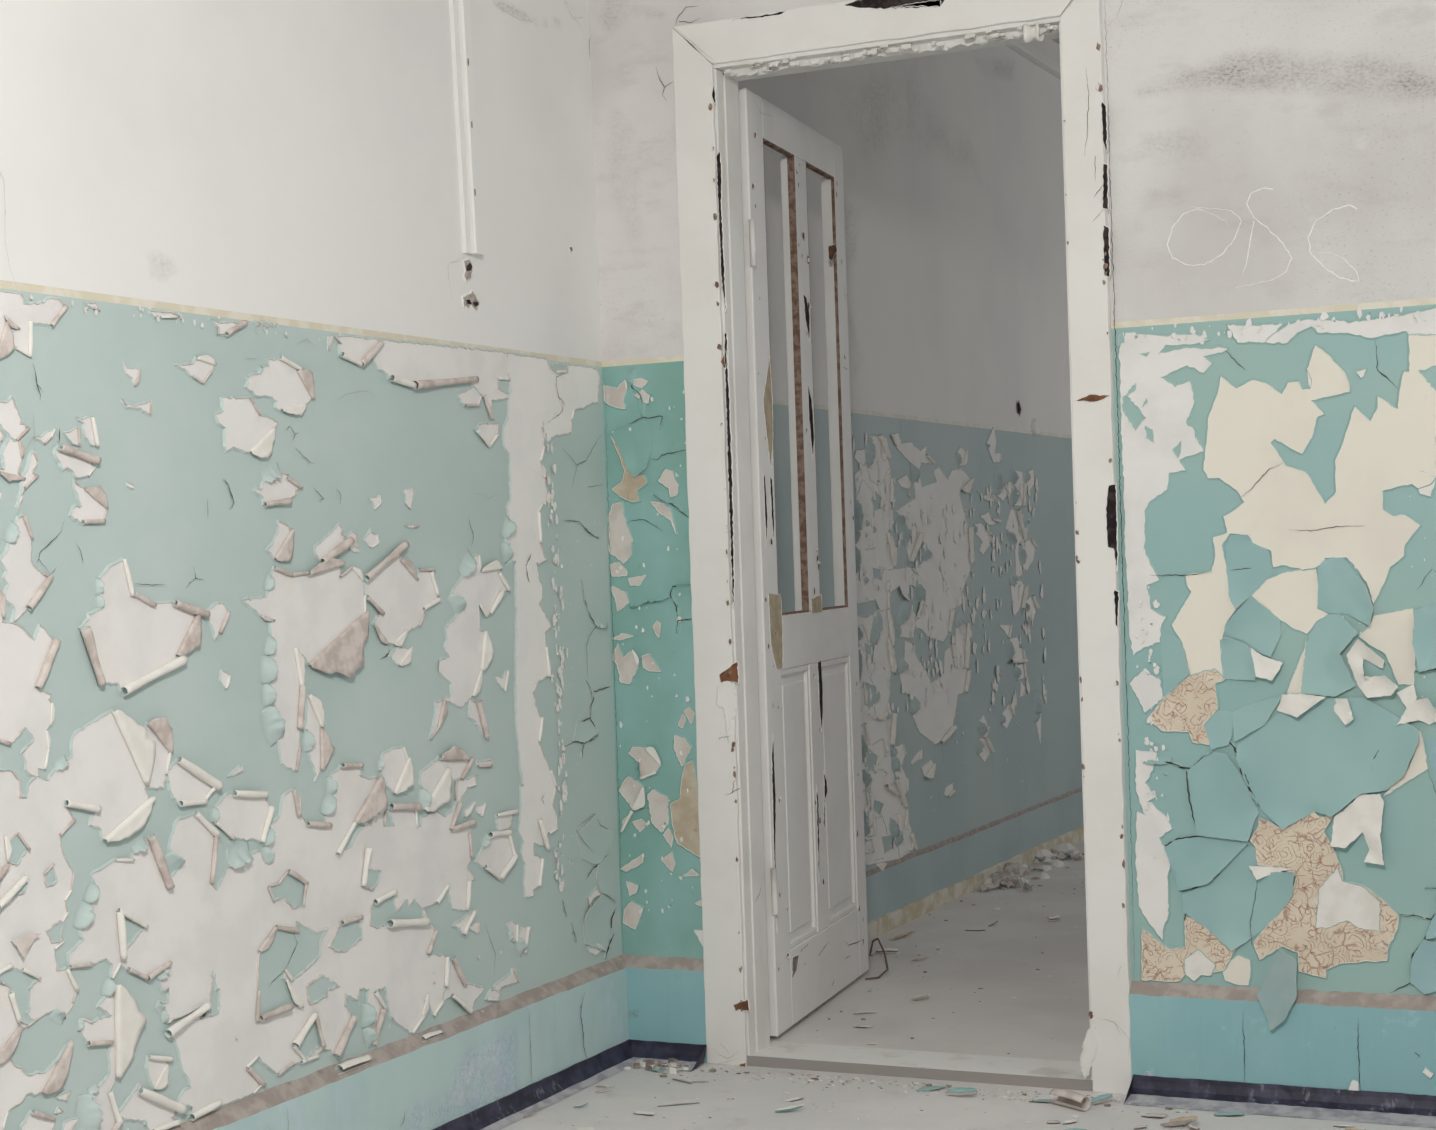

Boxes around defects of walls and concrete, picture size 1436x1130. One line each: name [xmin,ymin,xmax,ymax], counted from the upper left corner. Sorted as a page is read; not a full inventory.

peeling [844,0,946,10]
peeling [133,304,288,338]
flaking render [461,258,480,313]
crack [549,369,691,960]
peeling [852,427,1047,871]
peeling [1076,306,1436,1030]